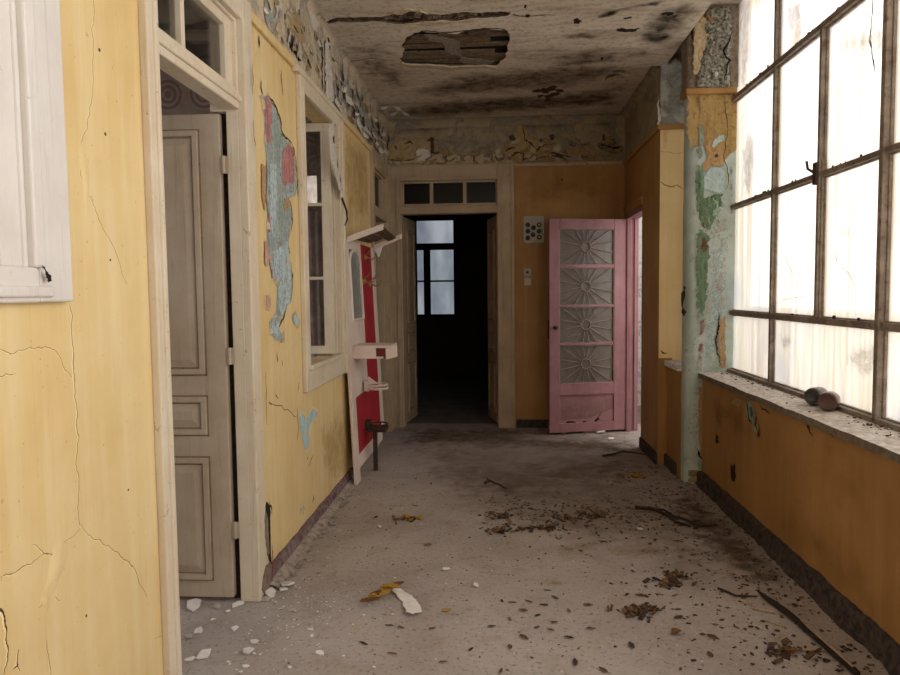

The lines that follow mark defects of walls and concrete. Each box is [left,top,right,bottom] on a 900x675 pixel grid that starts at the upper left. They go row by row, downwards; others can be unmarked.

crack [320,8,544,102]
flaking render [263,0,623,168]
damp [409,54,613,114]
damp [645,8,686,42]
spalling [690,6,733,87]
peeling [694,100,729,193]
peeling [252,64,302,343]
crack [0,306,147,597]
peeling [266,387,318,465]